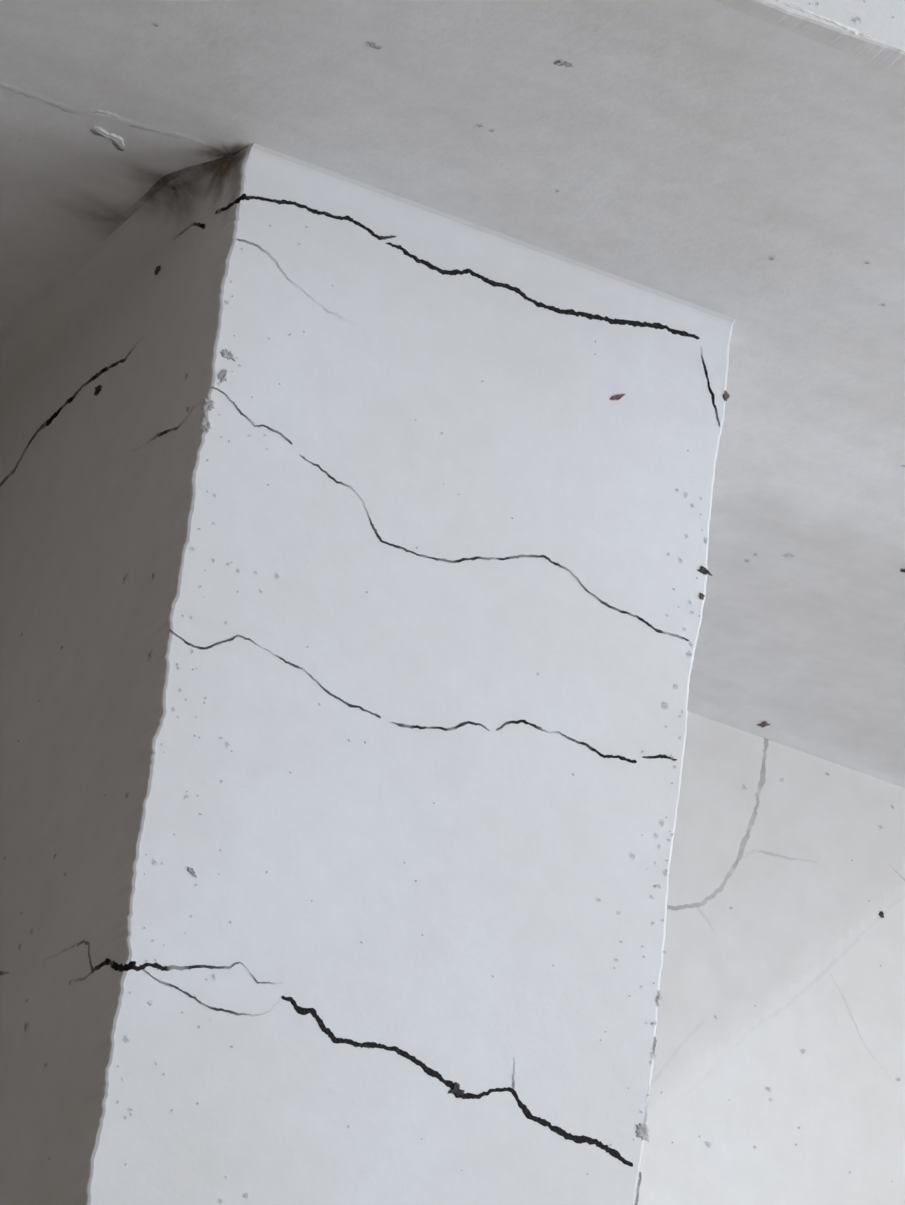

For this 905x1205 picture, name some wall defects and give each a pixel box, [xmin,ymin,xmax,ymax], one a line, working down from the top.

crack [193,193,720,427]
crack [1,356,127,486]
crack [219,390,343,485]
crack [169,629,253,650]
crack [369,518,689,641]
crack [278,657,677,763]
crack [91,958,633,1167]